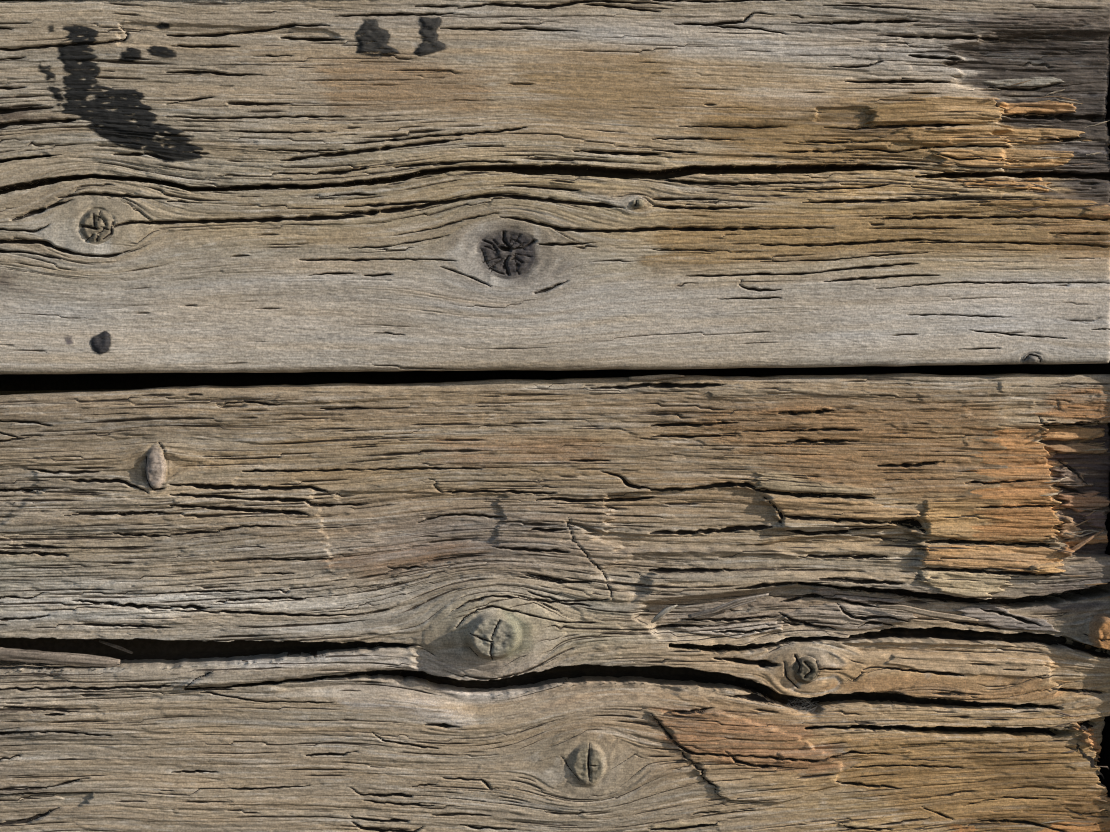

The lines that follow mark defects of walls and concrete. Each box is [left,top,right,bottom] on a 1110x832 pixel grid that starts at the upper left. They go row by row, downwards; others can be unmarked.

peeling [865,77,1098,207]
crack [0,379,1110,832]
peeling [754,426,1110,633]